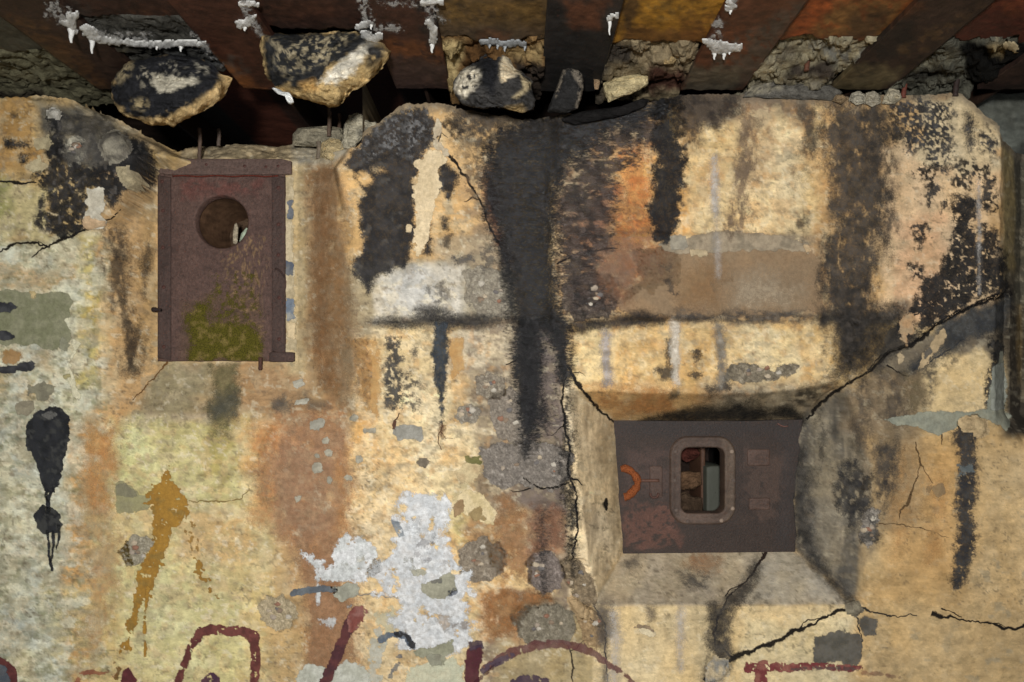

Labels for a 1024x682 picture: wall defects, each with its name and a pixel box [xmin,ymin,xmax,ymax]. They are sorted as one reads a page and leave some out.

leakage [2,110,158,239]
crack [438,133,502,248]
leakage [345,93,1011,599]
crack [806,290,1013,420]
crack [511,365,614,560]
peeling [333,582,360,602]
crack [569,606,608,682]
crack [723,552,767,606]
crack [712,607,1024,662]